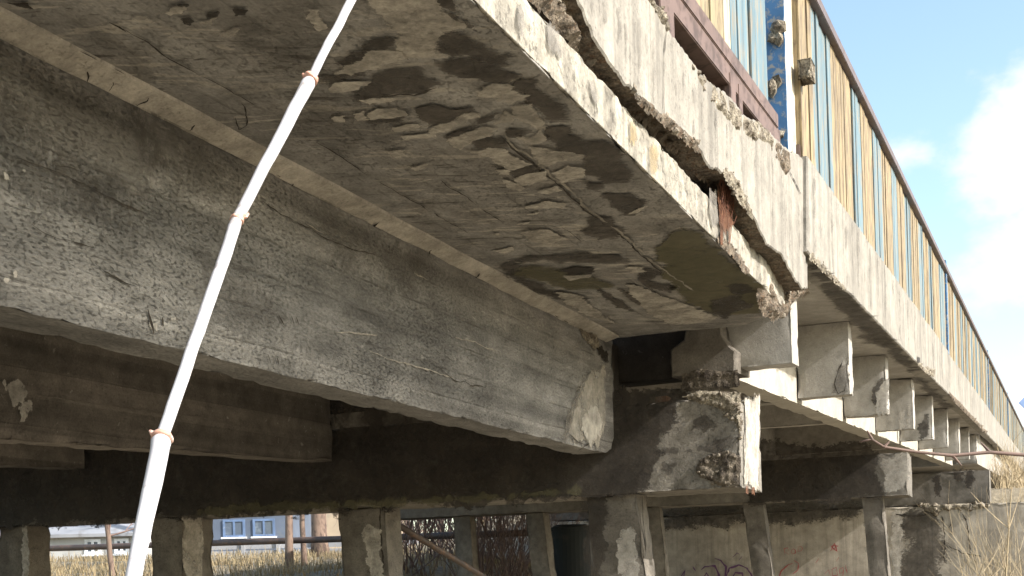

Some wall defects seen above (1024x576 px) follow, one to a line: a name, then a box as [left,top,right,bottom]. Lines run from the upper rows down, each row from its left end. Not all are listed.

spalling [528,0,600,80]
peeling [328,0,585,245]
water stain [317,0,647,240]
spalling [610,83,701,162]
spalling [692,64,791,175]
crack [261,200,375,255]
crack [503,138,594,217]
water stain [501,251,641,312]
crack [616,233,663,297]
water stain [638,188,775,319]
rust [717,179,737,245]
spalling [681,369,760,491]